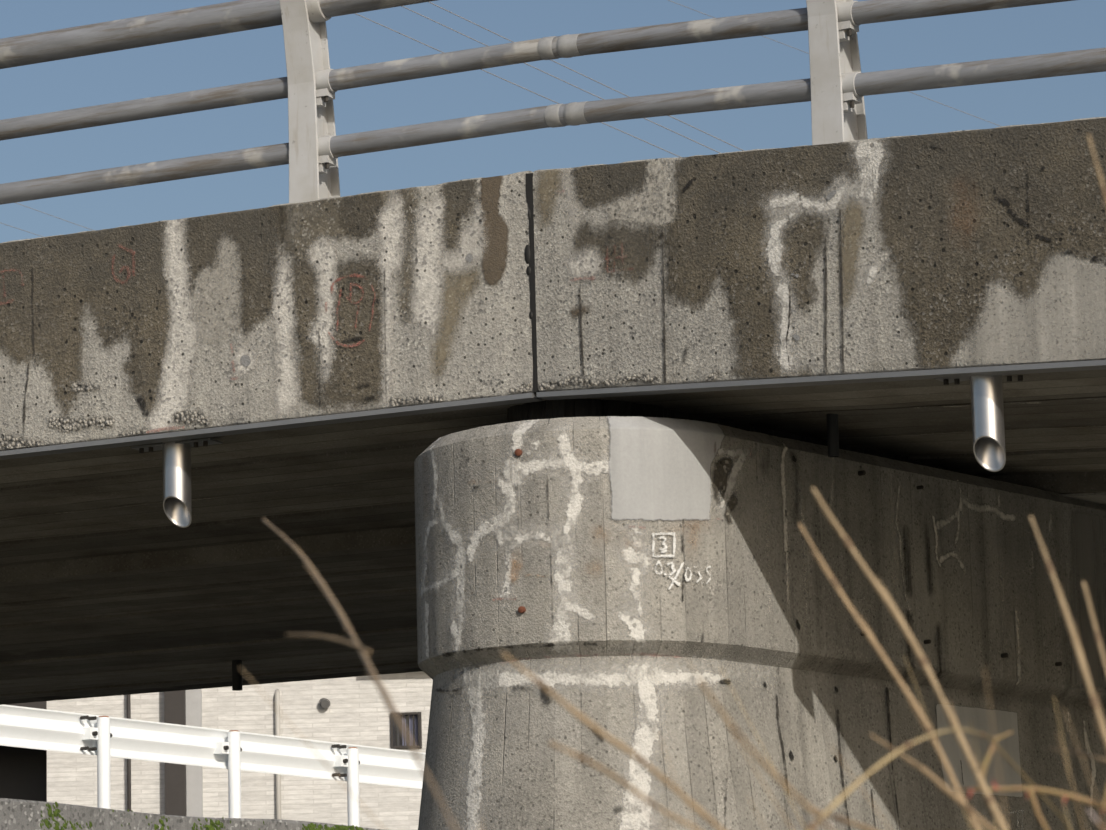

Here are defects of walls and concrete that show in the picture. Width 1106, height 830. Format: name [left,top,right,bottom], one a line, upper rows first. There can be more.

water stain [0,175,509,433]
water stain [538,118,1106,378]
spalling [712,447,750,523]
crack [420,419,789,830]
crack [837,687,900,830]